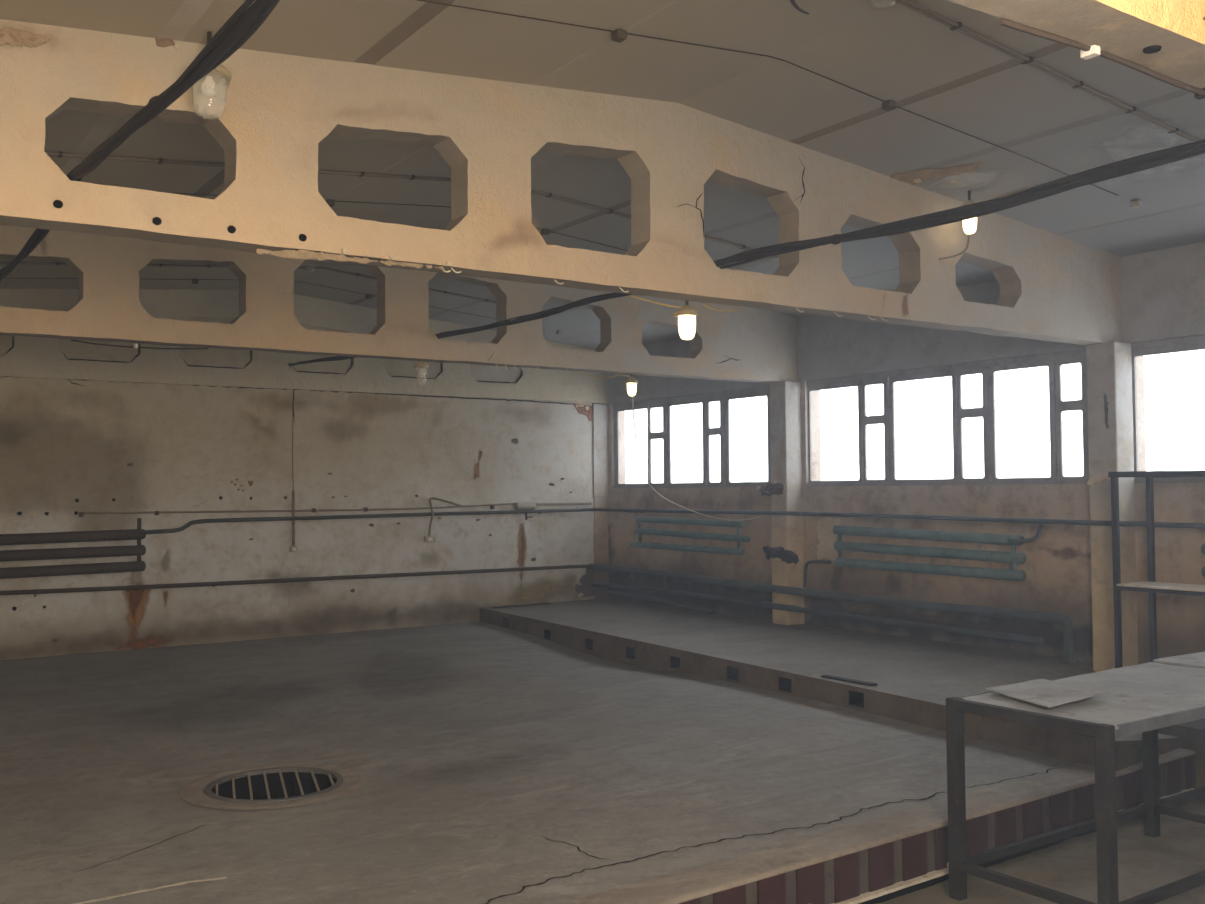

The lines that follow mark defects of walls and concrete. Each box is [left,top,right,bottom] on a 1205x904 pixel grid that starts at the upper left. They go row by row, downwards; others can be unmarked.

spalling [0,27,51,48]
crack [797,160,805,203]
crack [677,192,704,239]
rust [518,524,527,589]
rust [117,589,167,650]
crack [485,768,1055,904]